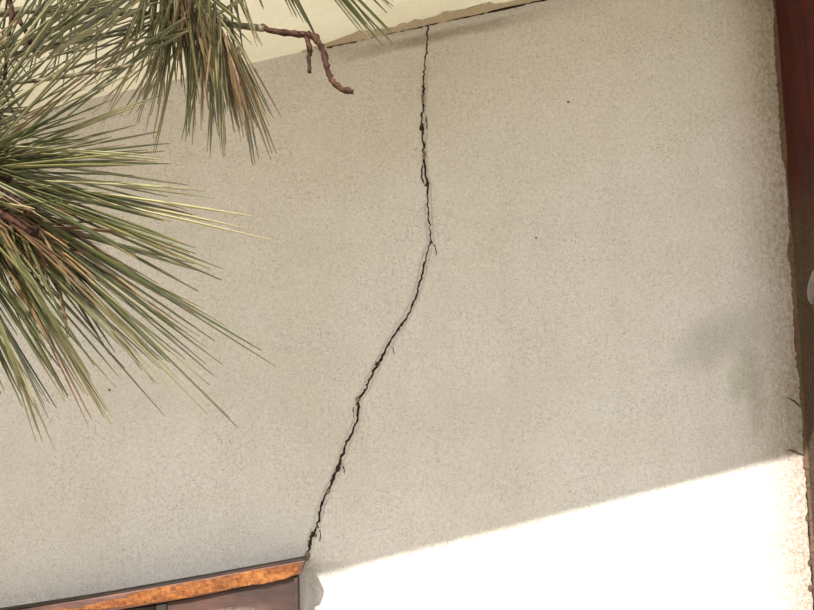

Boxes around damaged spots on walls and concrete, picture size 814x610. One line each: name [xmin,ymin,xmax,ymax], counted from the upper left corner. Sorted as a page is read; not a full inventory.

crack [303,0,547,562]
corrosion [55,564,300,610]